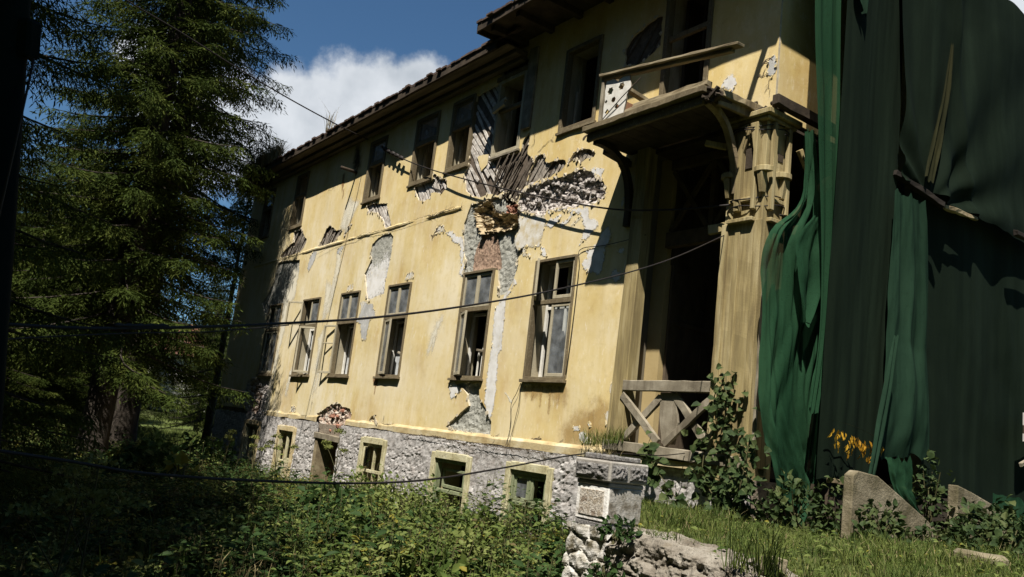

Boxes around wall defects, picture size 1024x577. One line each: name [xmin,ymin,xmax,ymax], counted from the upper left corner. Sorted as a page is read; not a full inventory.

flaking render [263,224,352,315]
flaking render [357,204,393,340]
flaking render [446,143,622,435]
spalling [317,402,352,432]